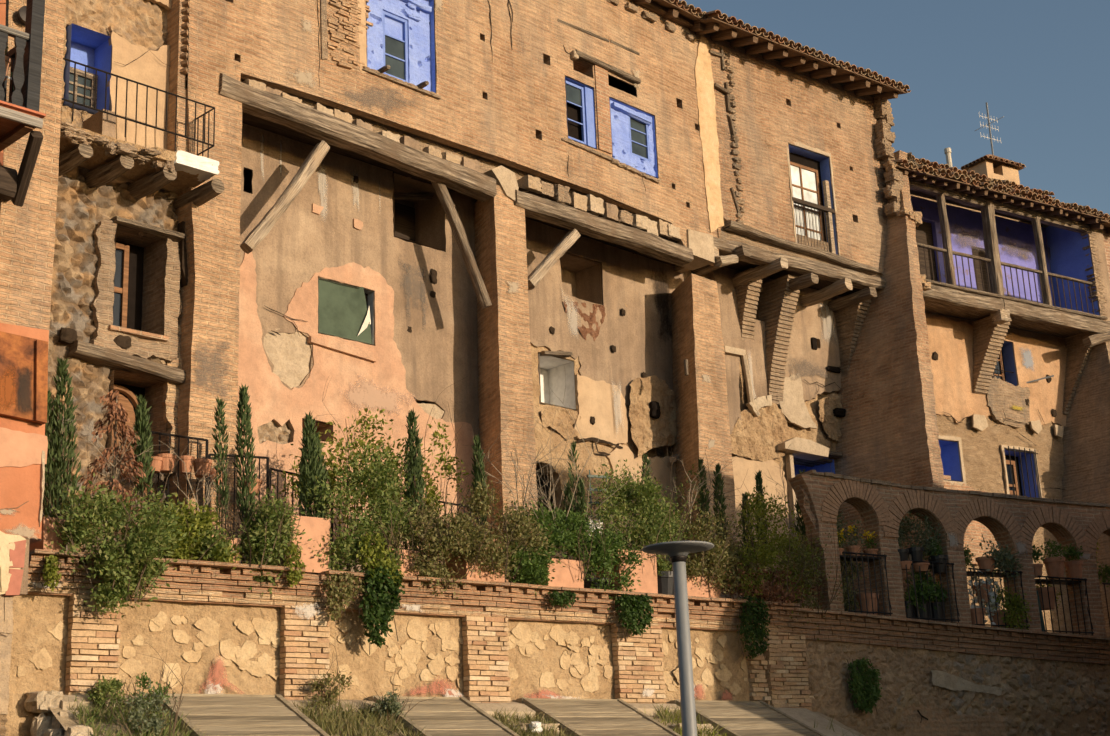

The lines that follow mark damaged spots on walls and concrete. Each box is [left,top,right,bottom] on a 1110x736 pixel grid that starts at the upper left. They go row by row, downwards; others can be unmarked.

crack [488,0,513,49]
spalling [263,329,311,389]
rust [0,367,32,413]
spalling [541,405,595,440]
spalling [649,401,661,419]
flaking render [746,395,772,414]
spalling [833,408,846,417]
flaking render [972,414,988,432]
flaking render [1029,409,1064,438]
flaking render [0,450,45,592]